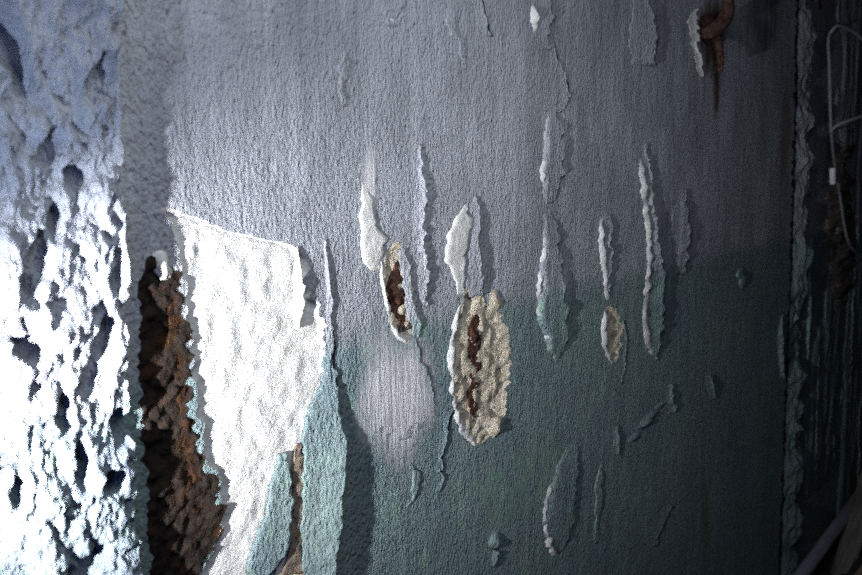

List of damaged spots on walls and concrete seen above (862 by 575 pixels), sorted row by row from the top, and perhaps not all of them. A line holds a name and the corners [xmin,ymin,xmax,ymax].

rust [701,38,719,111]
spalling [136,207,349,575]
spalling [359,145,432,344]
spalling [445,197,513,446]
spalling [598,215,629,385]
peeling [801,0,862,516]